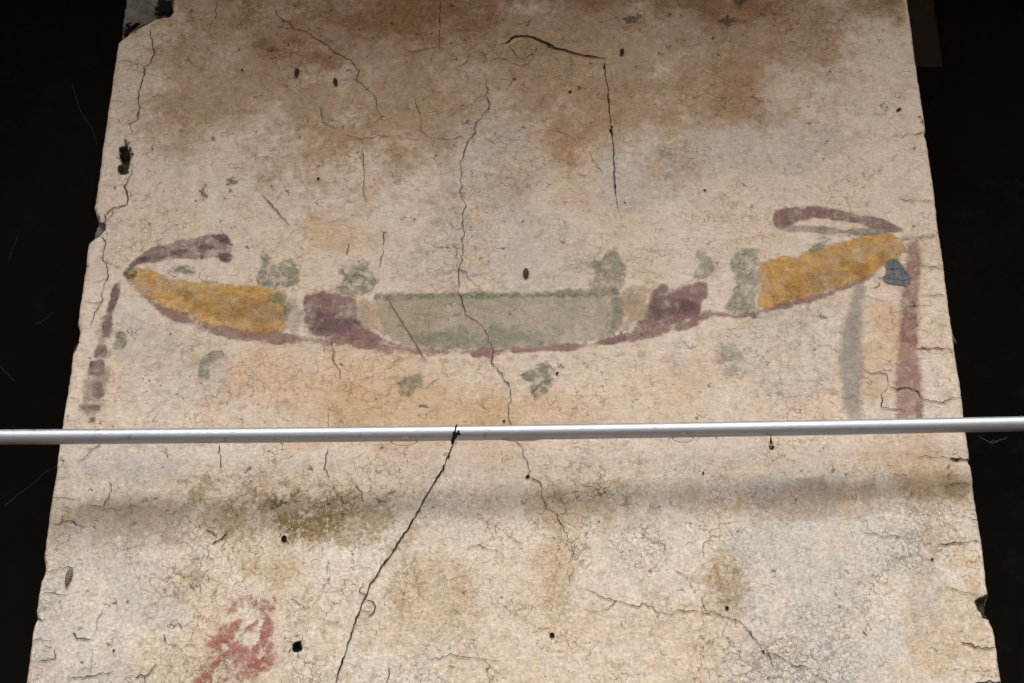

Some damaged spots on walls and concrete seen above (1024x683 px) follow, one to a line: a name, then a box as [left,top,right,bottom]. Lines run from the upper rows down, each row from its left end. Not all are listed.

crack [120,29,172,132]
crack [86,165,133,322]
crack [269,2,827,683]